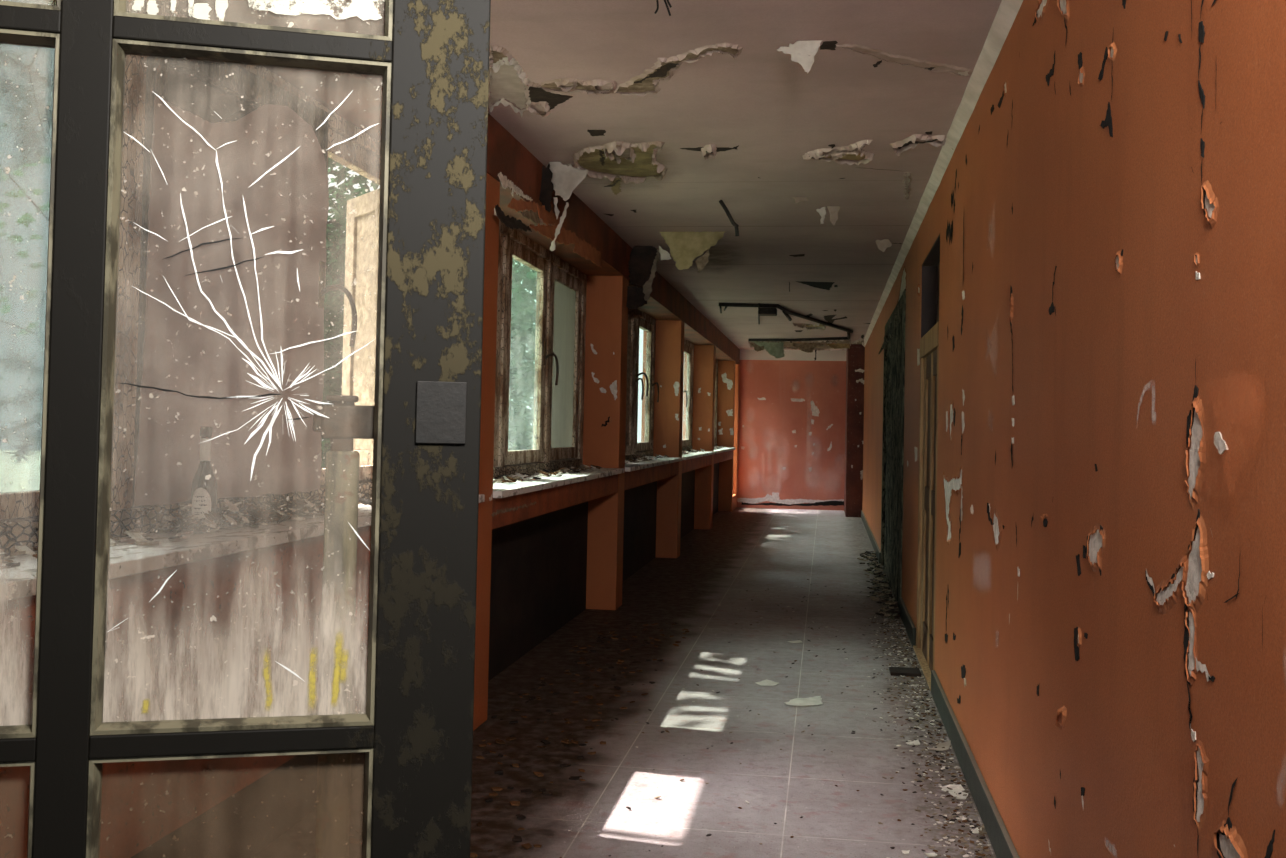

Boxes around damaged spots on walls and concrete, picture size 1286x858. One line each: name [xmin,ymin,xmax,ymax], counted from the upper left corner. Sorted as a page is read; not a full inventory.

peeling [1033,0,1070,41]
peeling [488,42,744,117]
peeling [777,40,974,77]
peeling [1070,27,1117,137]
peeling [680,144,739,160]
peeling [802,139,876,165]
peeling [889,131,947,156]
peeling [494,130,668,268]
peeling [1201,180,1219,229]
peeling [626,231,726,309]
peeling [943,389,1005,558]
peeling [1145,361,1275,858]